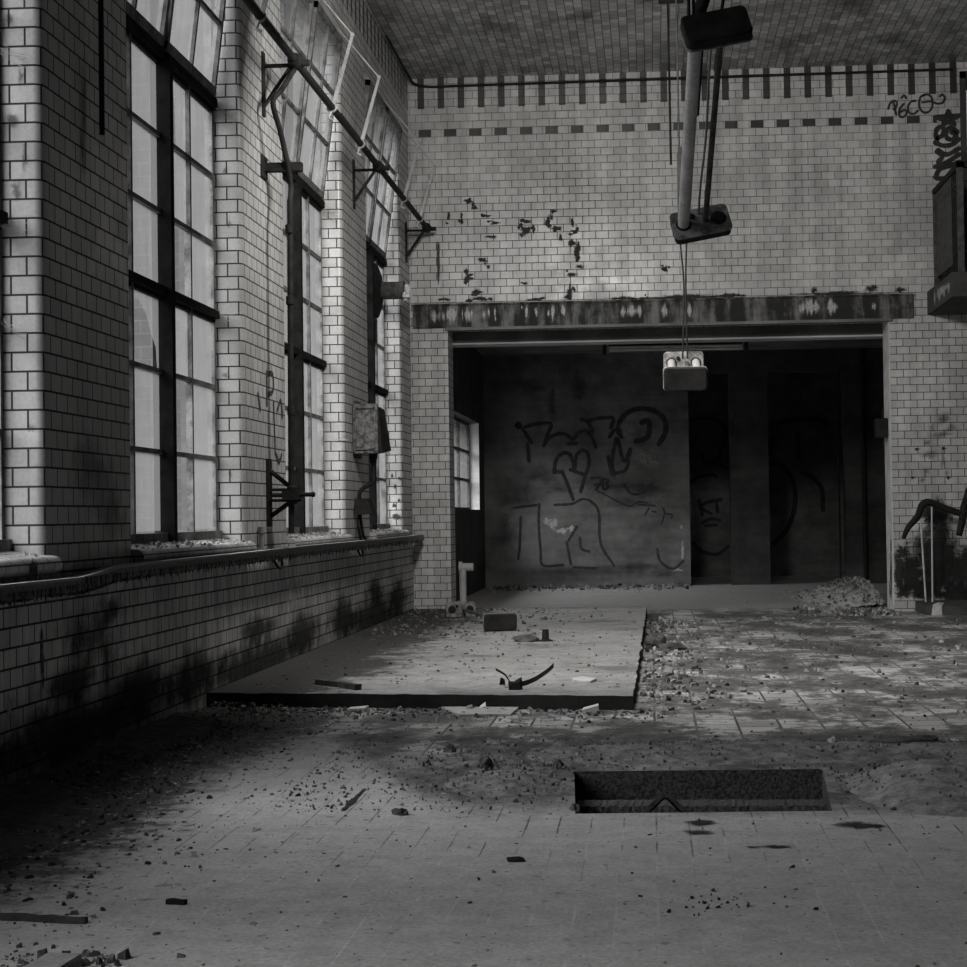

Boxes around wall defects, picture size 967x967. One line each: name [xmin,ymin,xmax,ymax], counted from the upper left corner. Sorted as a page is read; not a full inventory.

spalling [446,198,500,239]
spalling [517,209,584,300]
spalling [463,268,493,303]
leakage [432,306,496,322]